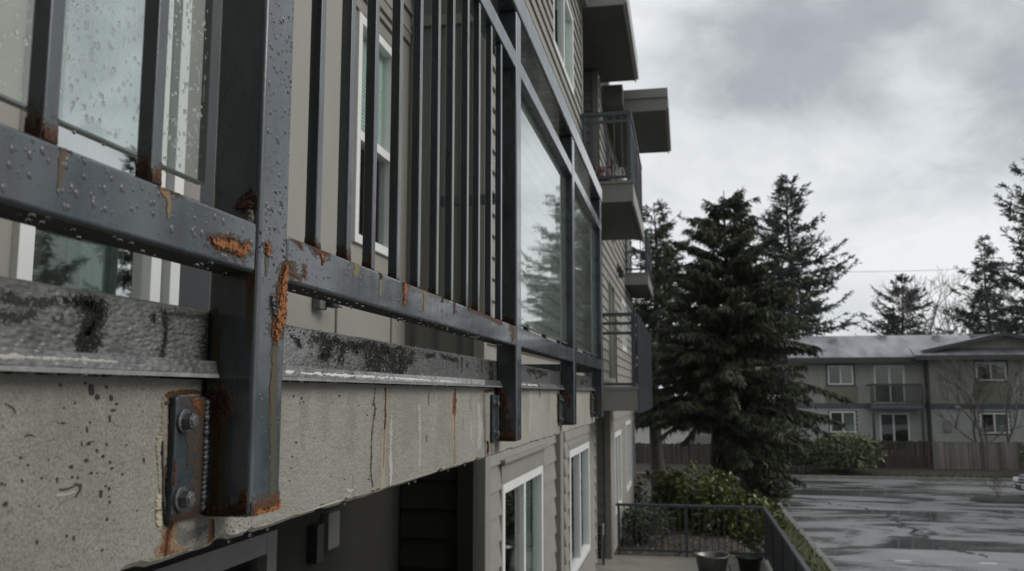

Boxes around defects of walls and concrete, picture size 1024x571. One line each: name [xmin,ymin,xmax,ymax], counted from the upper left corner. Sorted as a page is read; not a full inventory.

corrosion [24,98,86,191]
corrosion [135,141,184,218]
mould [0,289,114,352]
corrosion [150,188,516,560]
crack [369,388,377,487]
water stain [282,331,499,486]